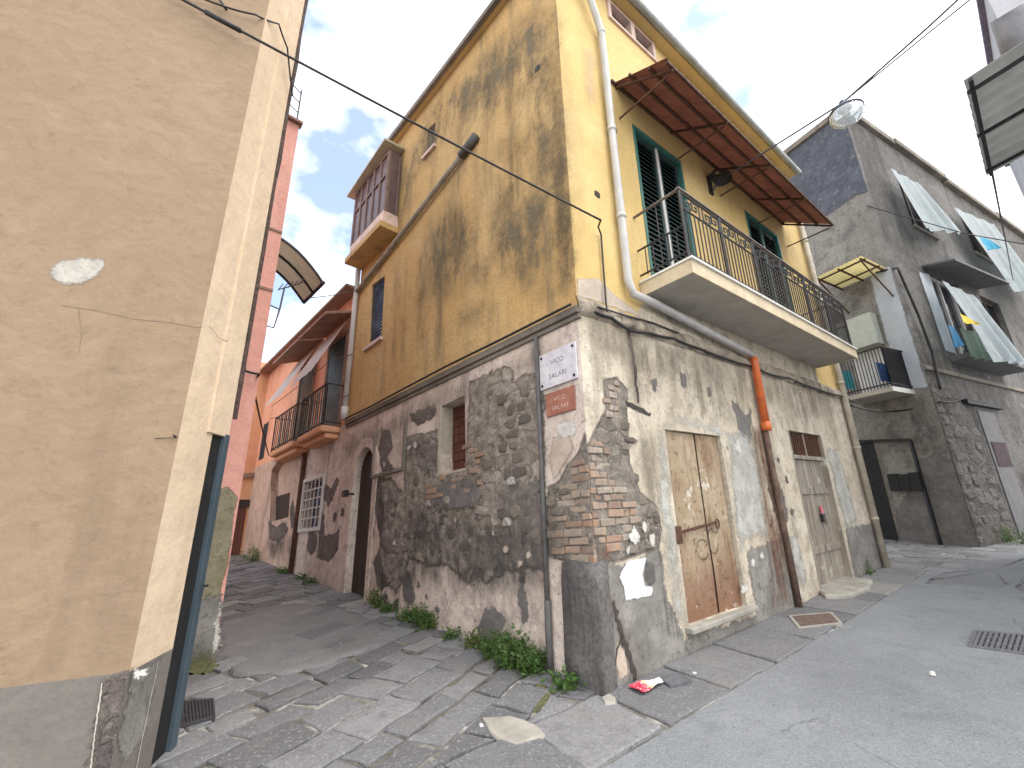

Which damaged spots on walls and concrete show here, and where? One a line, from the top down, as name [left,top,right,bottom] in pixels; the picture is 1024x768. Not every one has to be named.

leakage [434,24,545,114]
leakage [499,200,544,273]
peeling [203,487,238,657]
peeling [268,520,288,542]
peeling [307,478,344,562]
flaking render [372,365,662,624]